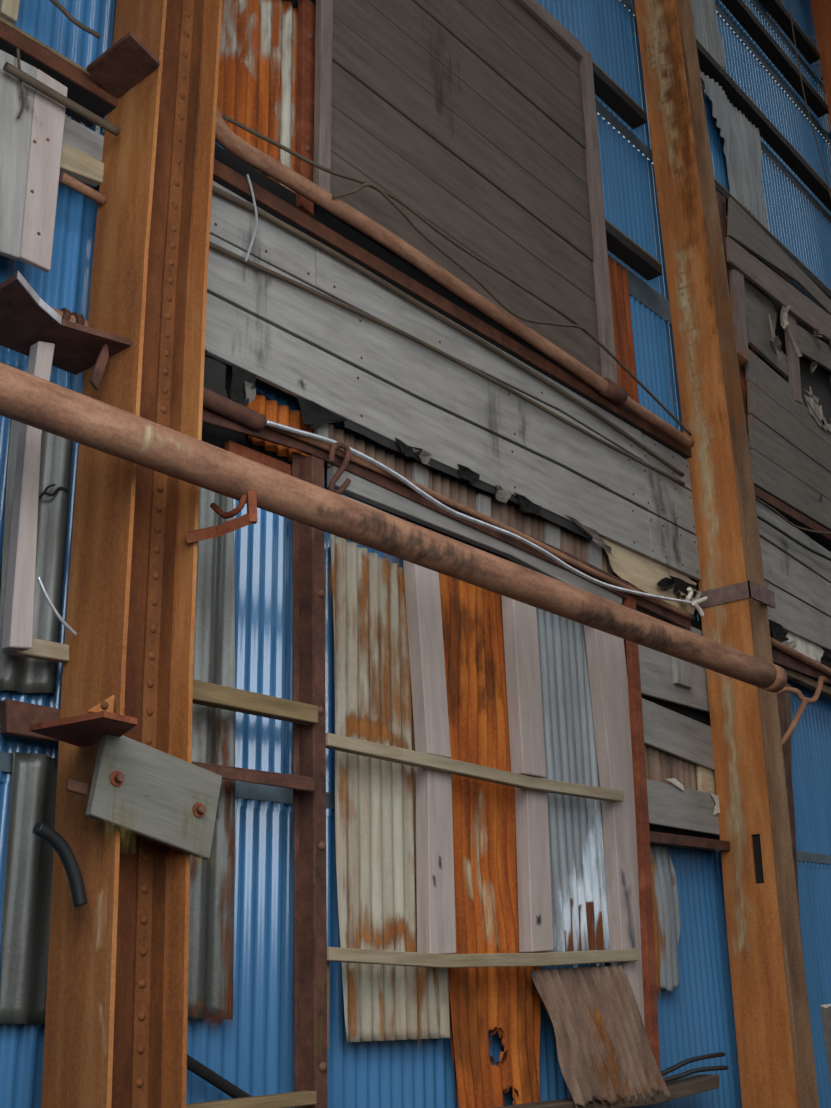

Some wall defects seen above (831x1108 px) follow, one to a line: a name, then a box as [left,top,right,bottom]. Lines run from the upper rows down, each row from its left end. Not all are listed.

rust [217,0,298,172]
peeling [203,349,256,406]
rust [245,395,314,433]
rust [608,256,639,403]
spalling [768,306,831,433]
peeling [297,396,702,615]
rust [601,548,620,579]
rust [346,555,415,751]
rust [439,573,511,772]
rust [347,876,417,952]
rust [451,774,540,954]
rust [417,966,541,1108]